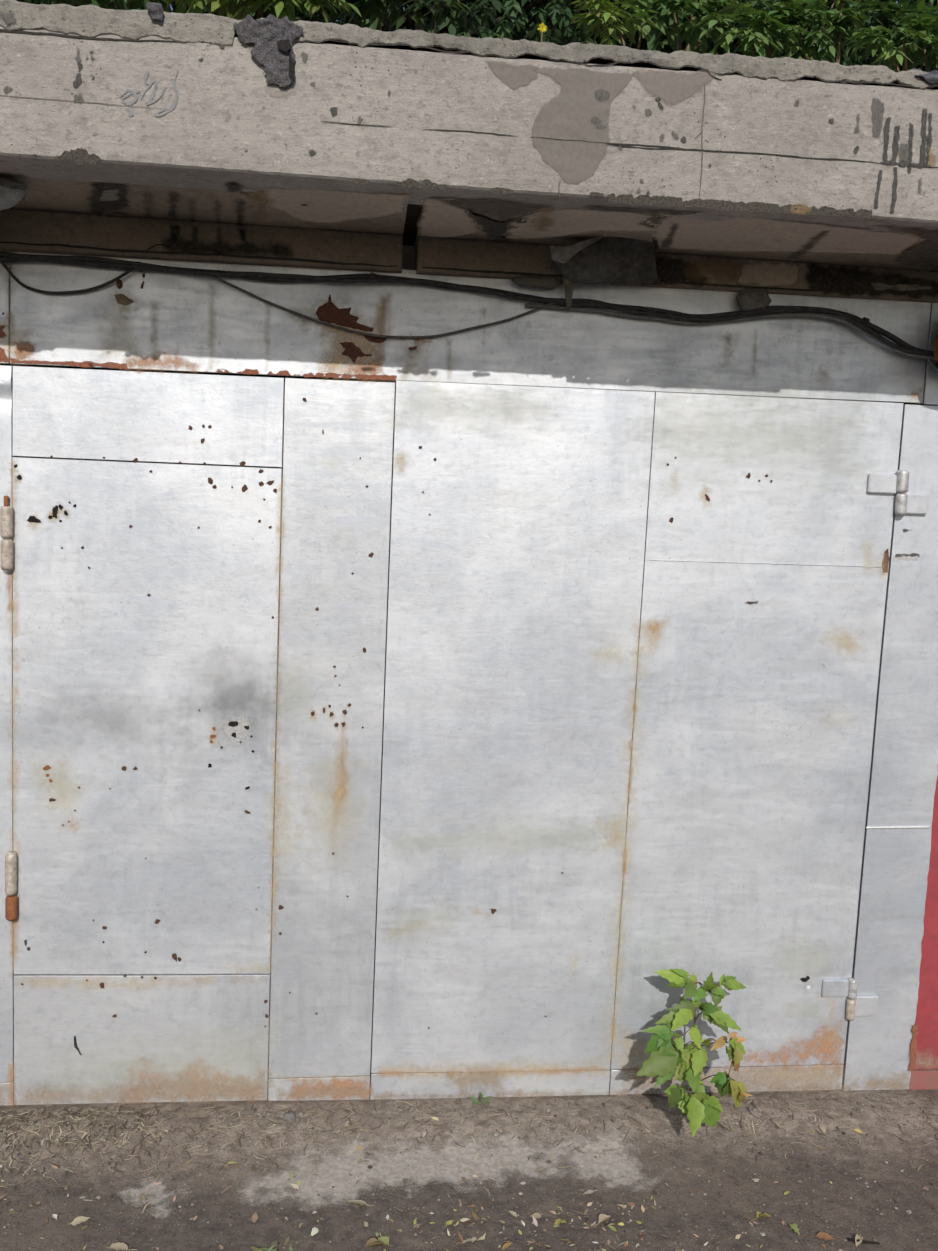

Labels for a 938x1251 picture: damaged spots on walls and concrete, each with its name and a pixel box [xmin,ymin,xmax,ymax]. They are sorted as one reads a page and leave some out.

water stain [789,98,938,298]
rust [114,273,145,305]
rust [0,295,397,381]
rust [284,1079,370,1099]